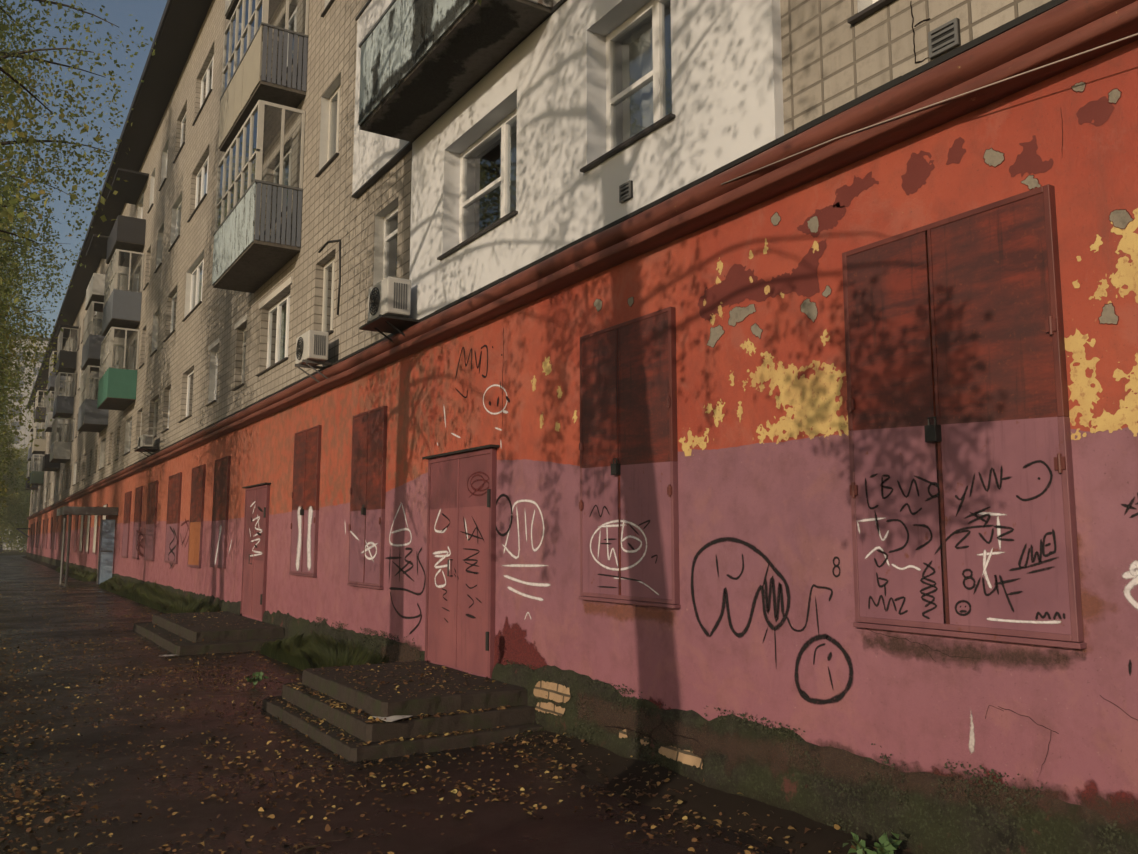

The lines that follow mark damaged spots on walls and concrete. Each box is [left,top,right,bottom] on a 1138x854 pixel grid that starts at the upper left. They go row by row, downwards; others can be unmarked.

peeling [1071,81,1122,127]
peeling [901,137,966,195]
peeling [983,135,1054,190]
peeling [679,171,879,456]
peeling [1076,208,1138,325]
peeling [1064,328,1138,440]
leakage [578,694,1138,830]
crack [985,705,1059,775]